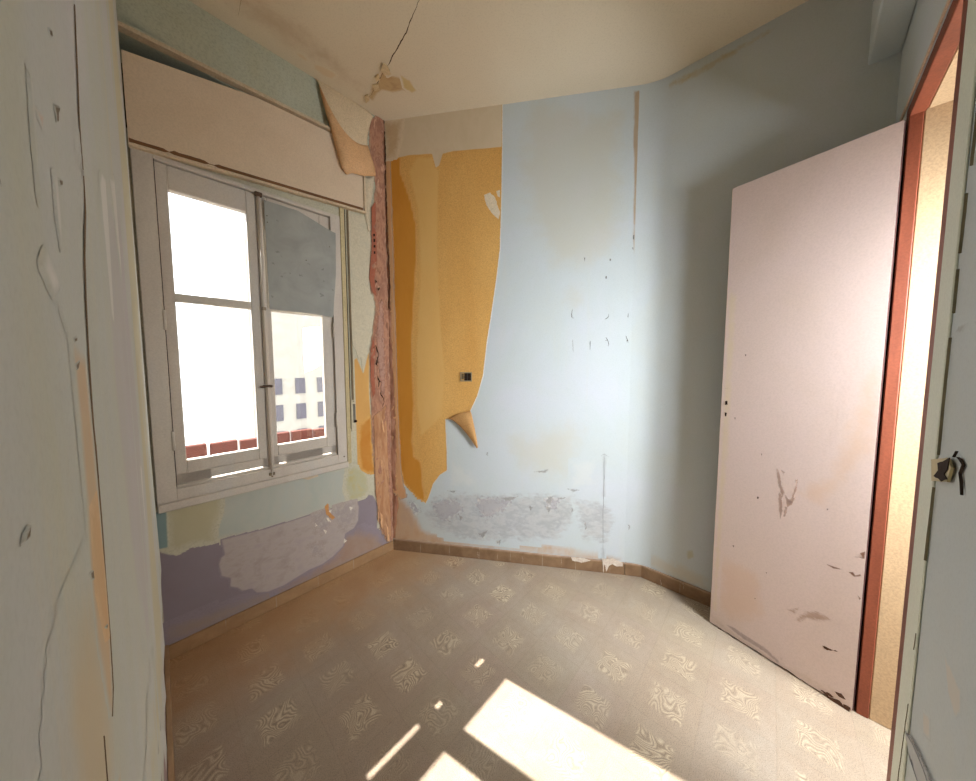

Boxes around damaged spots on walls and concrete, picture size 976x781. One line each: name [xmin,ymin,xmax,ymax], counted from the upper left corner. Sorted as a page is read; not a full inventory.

flaking render [365,61,419,103]
peeling [346,104,503,542]